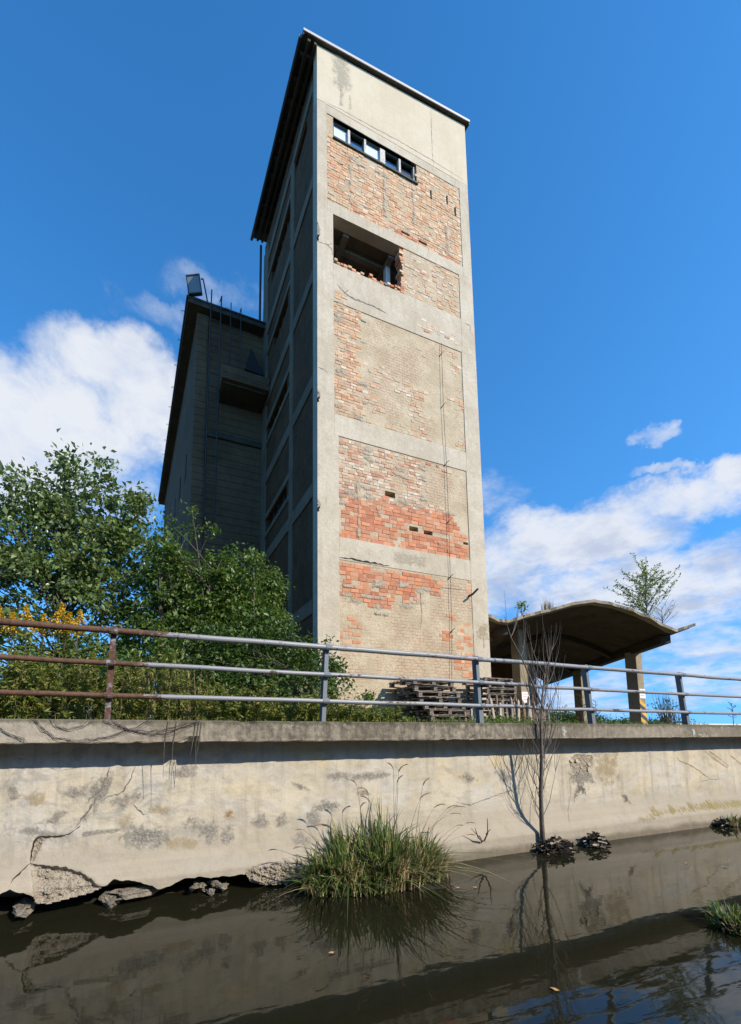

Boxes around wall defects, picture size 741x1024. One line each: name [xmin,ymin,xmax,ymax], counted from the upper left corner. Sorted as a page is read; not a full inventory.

damp [334,55,351,105]
flaking render [327,134,462,317]
flaking render [334,290,432,442]
flaking render [339,439,470,560]
flaking render [339,562,444,616]
flaking render [340,617,362,644]
flaking render [439,614,474,685]
peeling [569,754,593,775]
crack [11,767,146,889]
spalling [29,838,101,904]